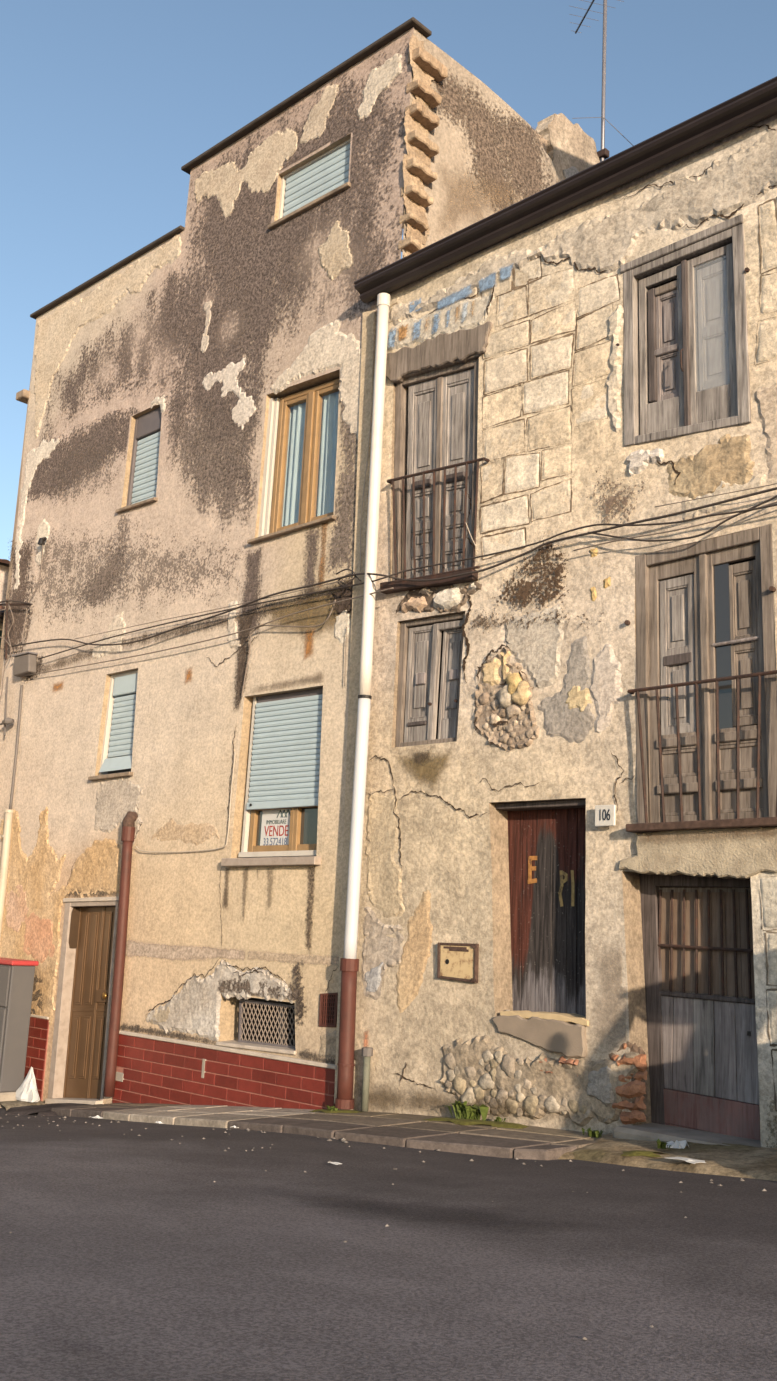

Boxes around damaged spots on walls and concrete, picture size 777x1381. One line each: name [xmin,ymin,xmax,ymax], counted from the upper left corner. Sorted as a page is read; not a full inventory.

peeling [194,84,339,219]
leakage [433,74,552,214]
leakage [3,38,407,709]
peeling [202,357,257,430]
peeling [271,319,361,440]
leakage [387,301,474,349]
spalling [626,383,777,520]
mould [465,533,604,634]
spalling [396,582,623,752]
crack [368,755,538,866]
peeling [0,777,220,1027]
spalling [144,958,293,1041]